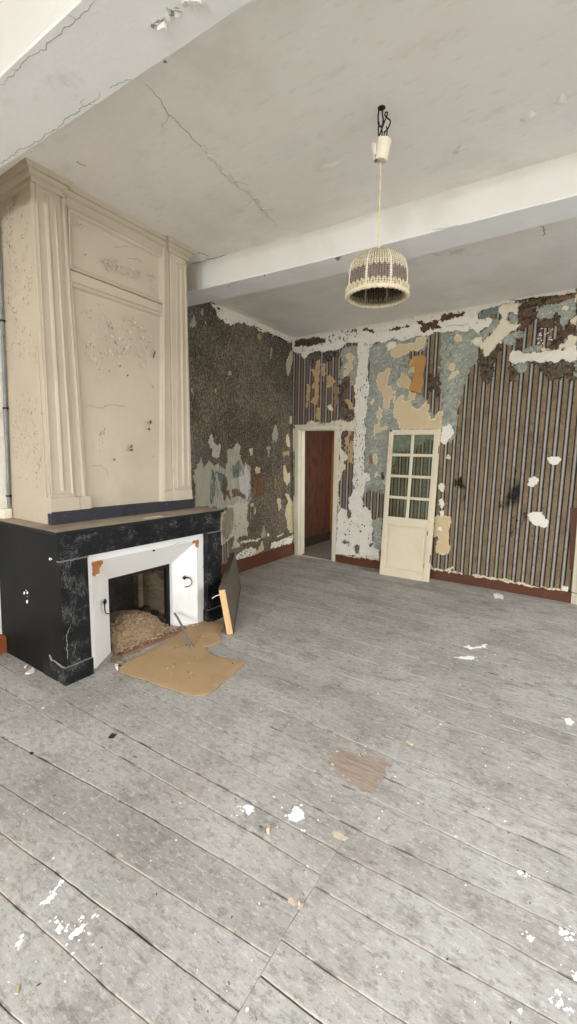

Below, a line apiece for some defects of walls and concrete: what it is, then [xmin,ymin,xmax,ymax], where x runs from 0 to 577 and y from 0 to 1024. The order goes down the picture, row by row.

crack [0,0,95,85]
spalling [151,0,205,33]
crack [3,79,276,225]
flaking render [192,288,577,561]